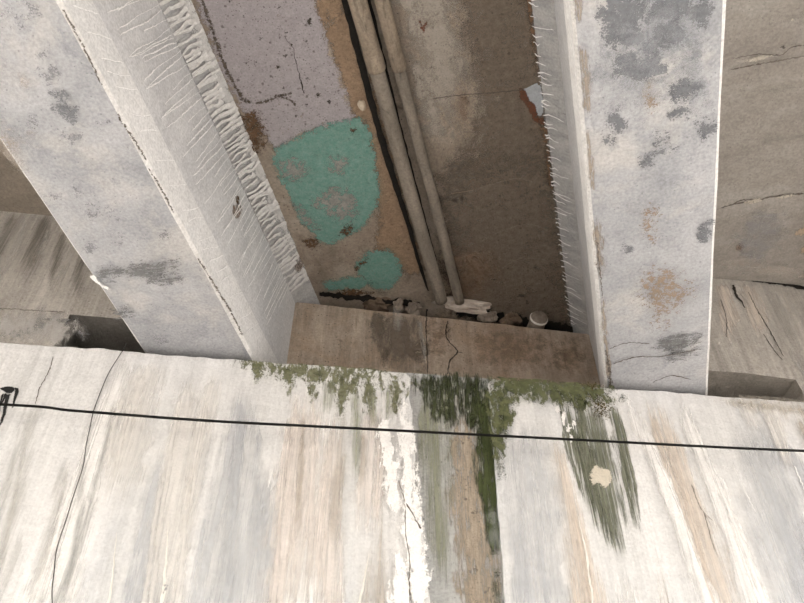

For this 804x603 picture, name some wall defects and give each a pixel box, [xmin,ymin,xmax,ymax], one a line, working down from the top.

crack [732,45,804,70]
crack [722,193,804,208]
water stain [371,314,429,362]
crack [425,309,462,374]
water stain [651,331,704,363]
crack [720,285,783,360]
water stain [765,411,790,460]
water stain [137,382,216,603]
peeling [375,398,433,603]
water stain [234,360,723,603]
water stain [681,408,769,603]